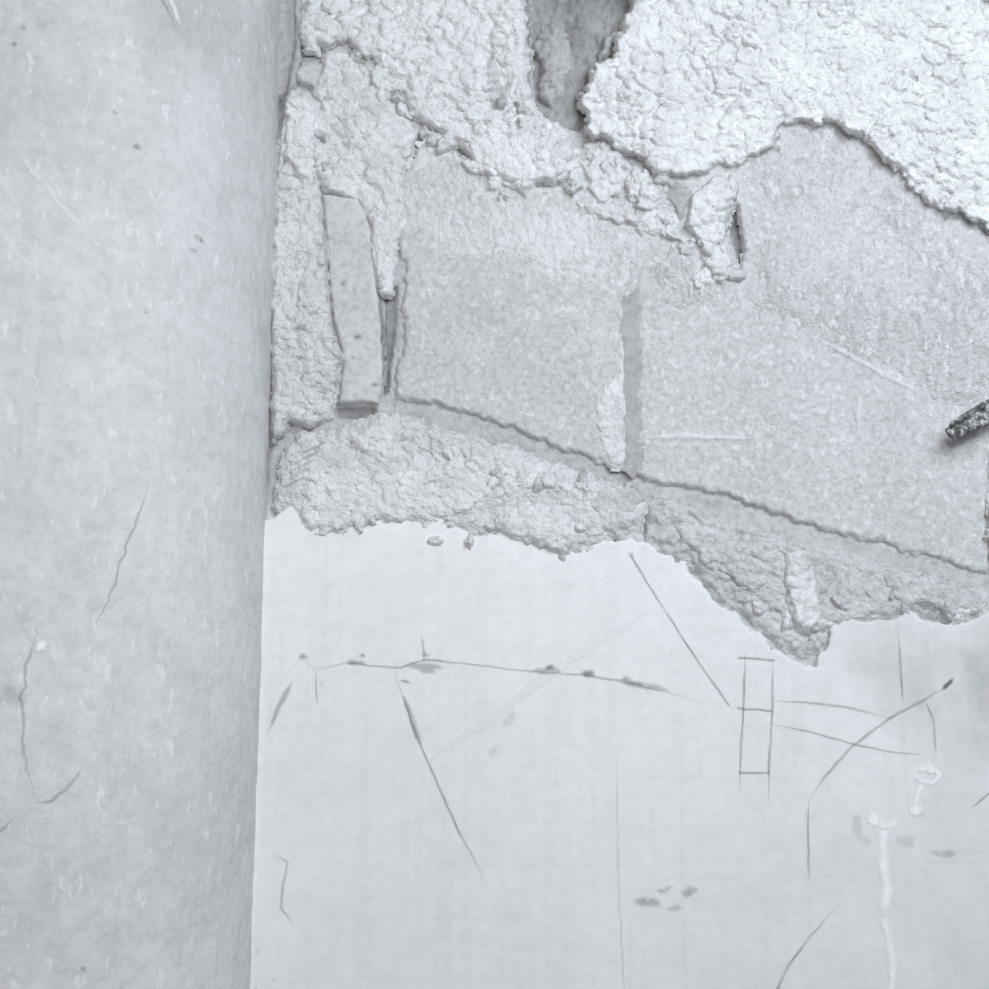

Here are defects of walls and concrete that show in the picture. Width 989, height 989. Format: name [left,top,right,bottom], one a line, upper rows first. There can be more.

spalling [267,0,989,667]
water stain [867,813,898,989]